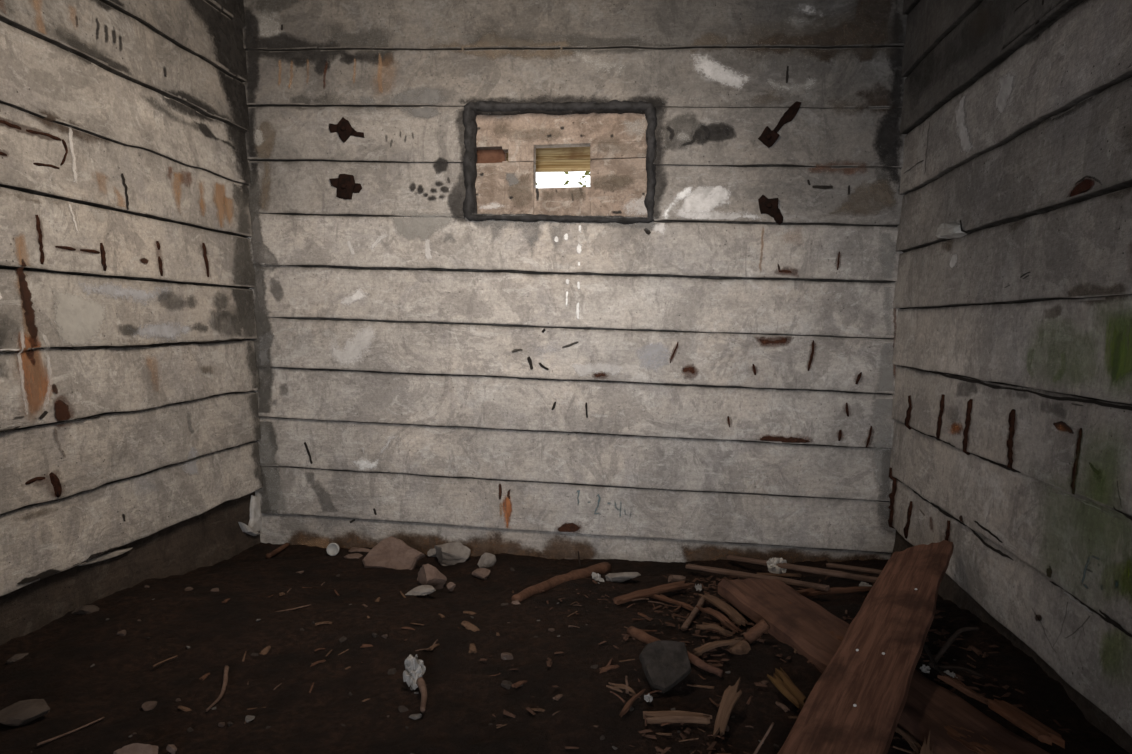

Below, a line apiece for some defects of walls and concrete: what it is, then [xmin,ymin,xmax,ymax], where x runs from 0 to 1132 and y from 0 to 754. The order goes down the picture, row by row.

damp [446,32,644,59]
damp [695,33,747,88]
damp [410,96,610,266]
damp [601,97,755,233]
corrosion [16,237,50,410]
corrosion [498,484,512,527]
damp [289,531,378,549]
damp [394,533,596,560]
damp [683,546,885,563]